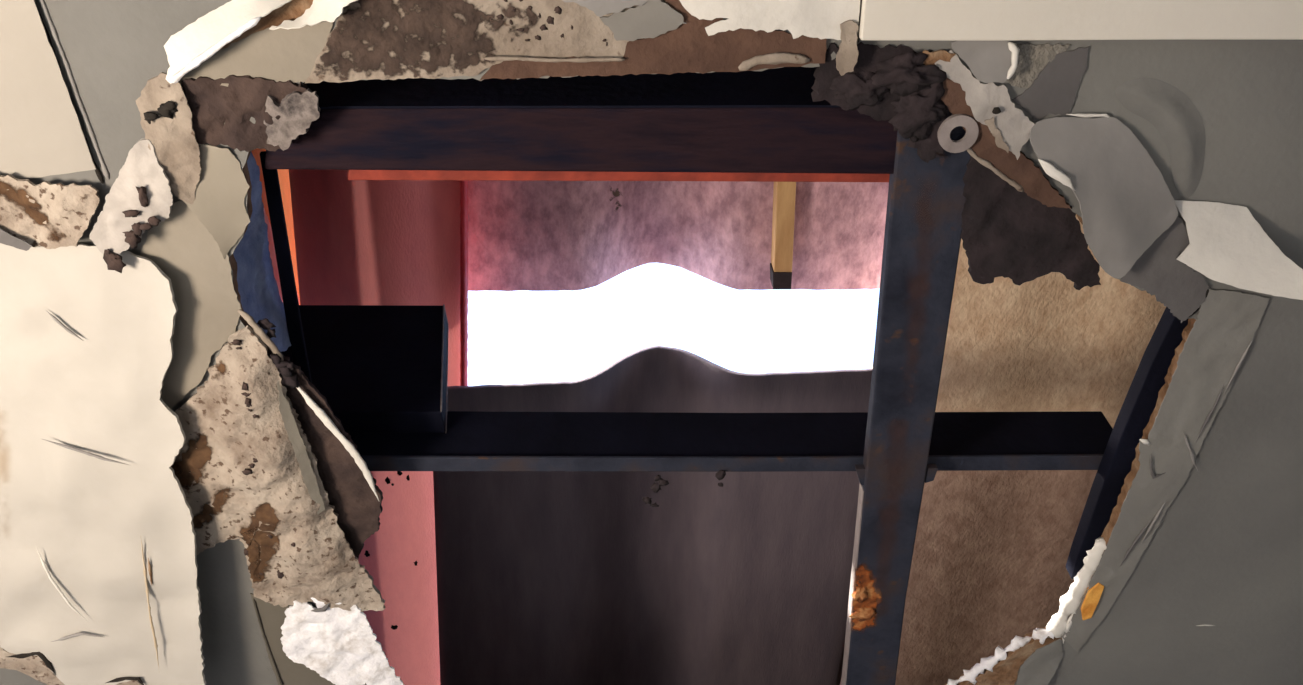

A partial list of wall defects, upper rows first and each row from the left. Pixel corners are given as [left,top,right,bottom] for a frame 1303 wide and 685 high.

flaking render [305,0,862,83]
peeling [951,41,1071,88]
leakage [0,181,66,242]
peeling [1029,113,1303,317]
peeling [264,209,300,305]
leakage [171,434,212,489]
leakage [193,489,231,529]
leakage [231,502,295,583]
flaking render [280,597,404,685]
rust [849,564,881,631]
spalling [947,537,1107,685]